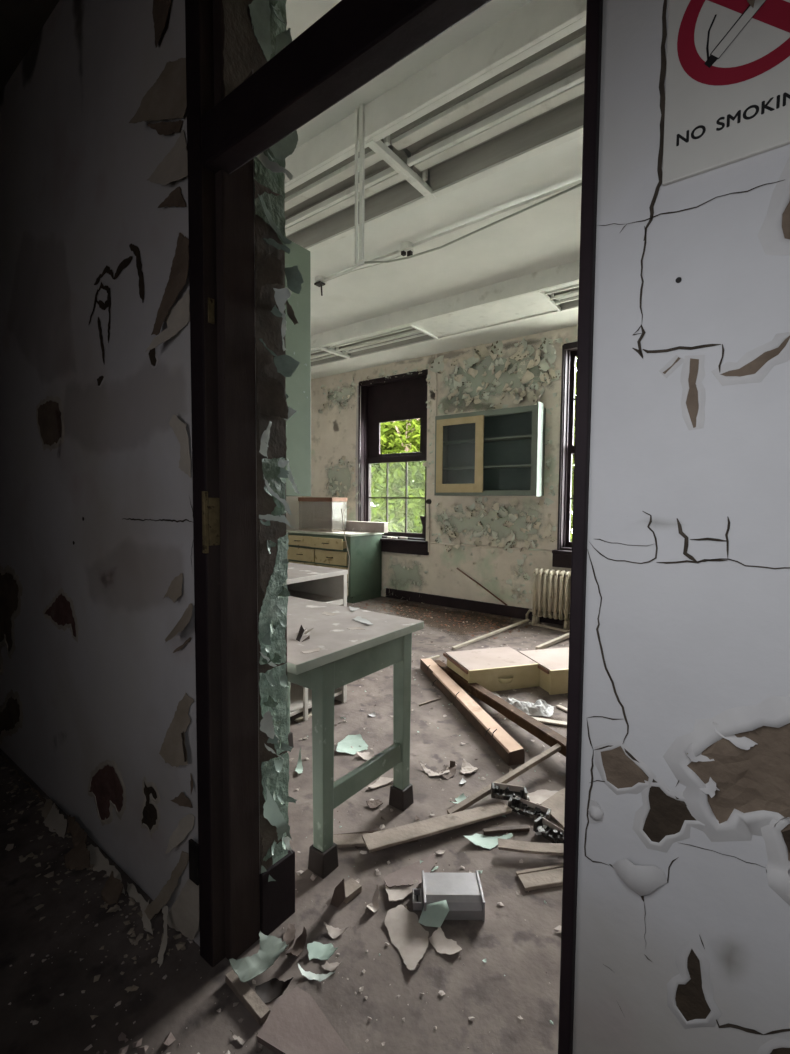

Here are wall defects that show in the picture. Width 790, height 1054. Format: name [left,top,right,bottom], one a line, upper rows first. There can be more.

peeling [222,0,292,97]
crack [599,0,783,372]
peeling [145,232,190,370]
peeling [253,130,304,882]
peeling [318,336,577,553]
peeling [659,332,790,430]
crack [584,511,790,867]
peeling [88,844,199,968]
flaking render [594,696,790,906]
crack [667,843,765,883]
peeling [667,939,722,1029]
crack [716,1019,790,1035]